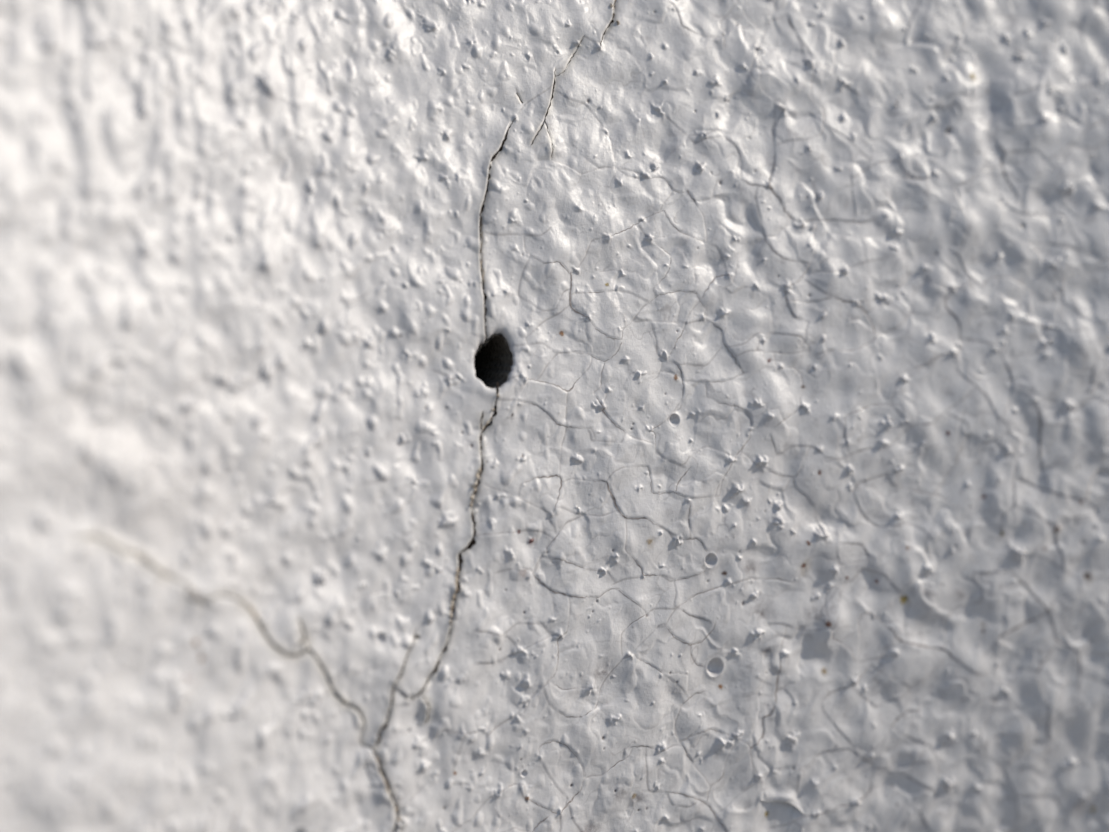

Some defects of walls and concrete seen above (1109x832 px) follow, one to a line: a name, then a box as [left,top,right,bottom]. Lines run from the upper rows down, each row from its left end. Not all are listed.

crack [480,0,620,340]
crack [726,138,875,223]
crack [850,139,1043,214]
crack [912,253,1034,429]
crack [526,177,810,717]
crack [1001,357,1109,569]
crack [841,473,899,591]
crack [680,657,782,765]
crack [828,604,987,694]
crack [996,566,1080,740]
crack [530,741,583,831]
crack [662,769,727,832]